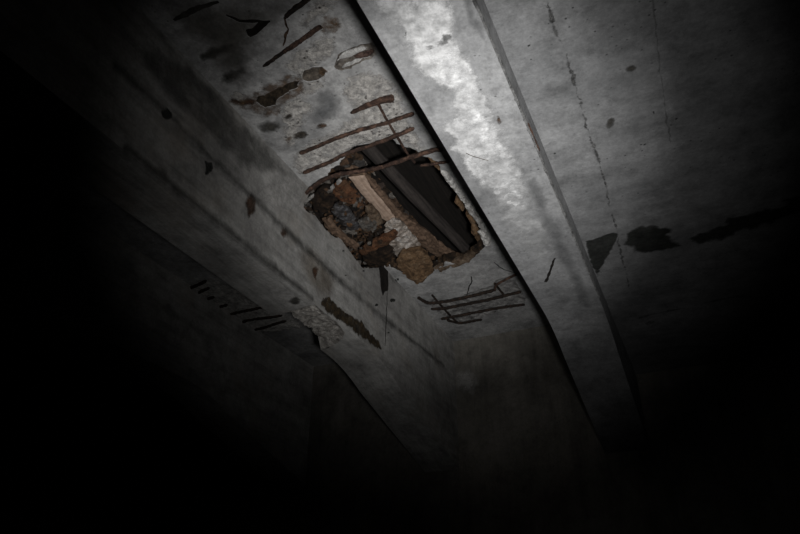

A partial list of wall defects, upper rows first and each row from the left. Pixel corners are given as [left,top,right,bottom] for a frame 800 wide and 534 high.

peeling [231,0,547,272]
crack [544,258,556,282]
water stain [586,226,679,273]
spalling [190,280,345,348]
corrosion [321,297,381,349]